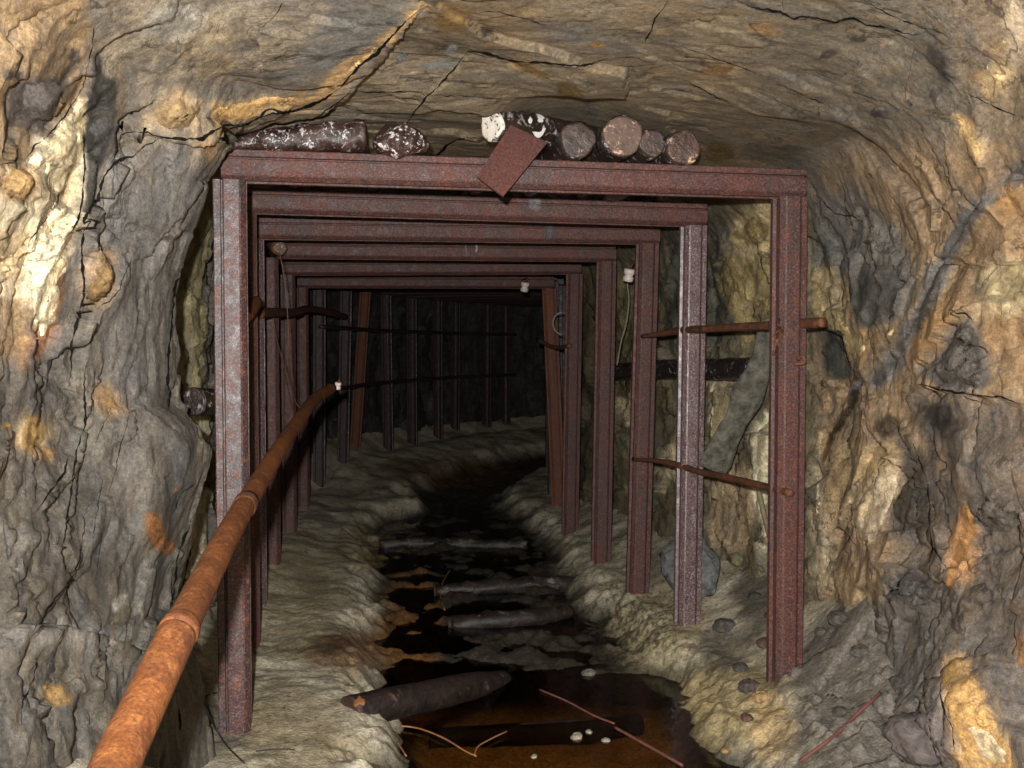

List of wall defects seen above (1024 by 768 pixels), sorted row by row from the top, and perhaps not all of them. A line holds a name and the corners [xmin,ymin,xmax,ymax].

corrosion [146,512,176,555]